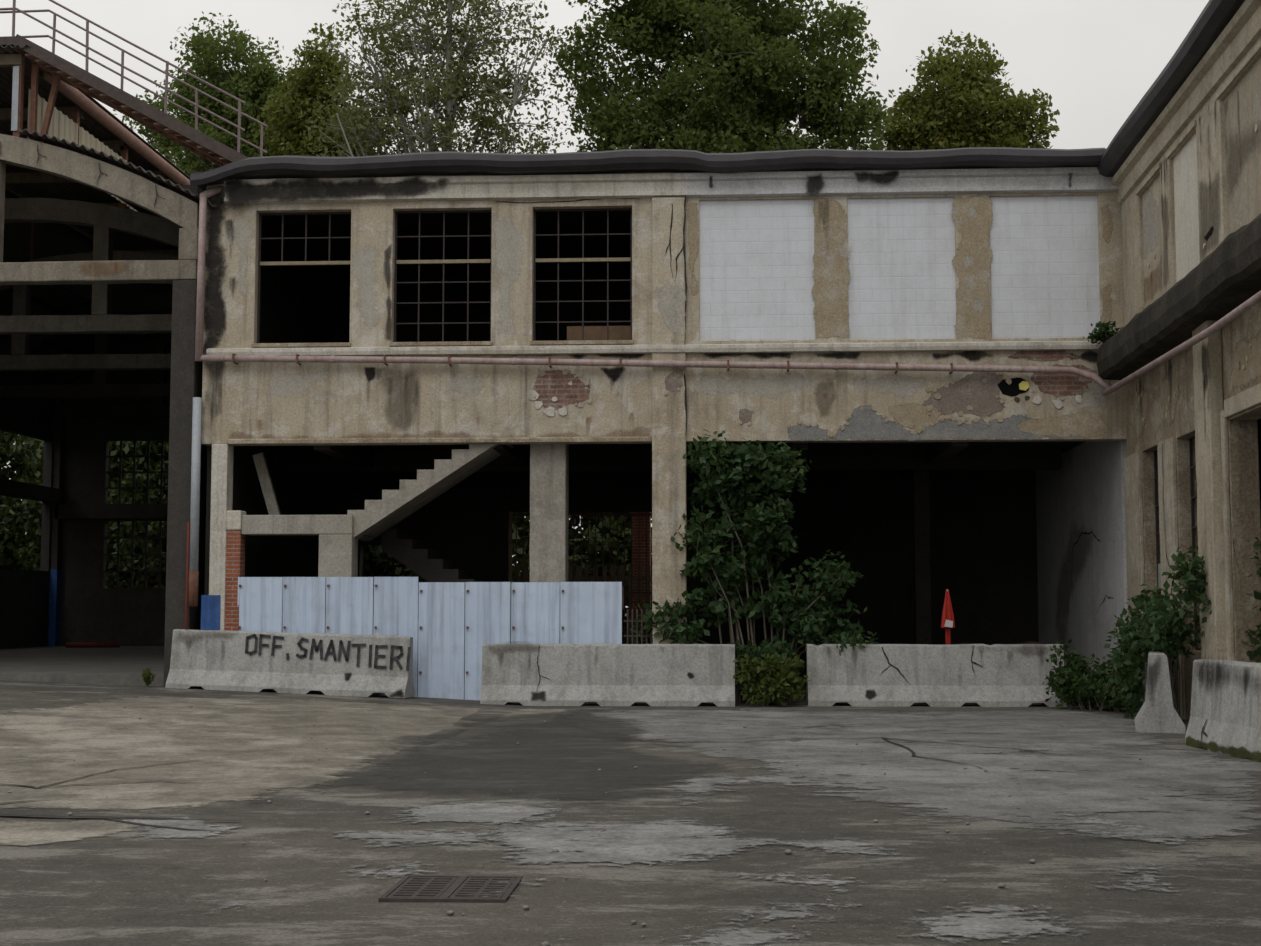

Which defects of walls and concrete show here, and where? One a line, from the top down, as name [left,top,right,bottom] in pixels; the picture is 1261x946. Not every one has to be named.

peeling [811,197,851,338]
peeling [952,195,993,340]
flaking render [528,368,592,416]
flaking render [787,350,1110,441]
crack [880,647,911,685]